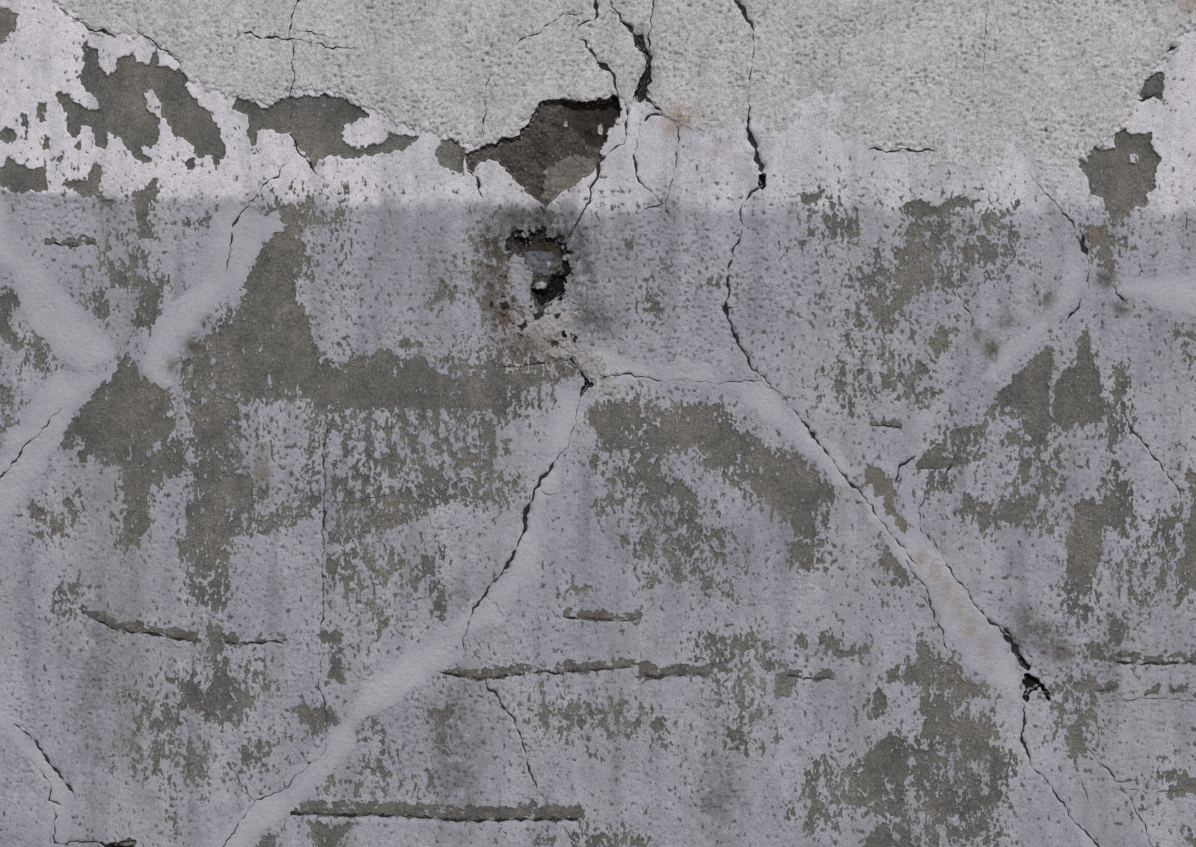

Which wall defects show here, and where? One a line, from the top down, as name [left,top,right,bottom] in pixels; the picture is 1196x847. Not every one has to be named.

crack [52,0,182,65]
crack [462,0,1031,671]
peeling [774,172,1042,435]
crack [1038,184,1126,322]
peeling [1078,128,1161,275]
peeling [0,41,835,847]
peeling [864,463,907,533]
peeling [916,319,1196,760]
crack [14,724,108,847]
crack [485,682,577,845]
peeling [766,628,1021,847]
crack [1020,704,1182,847]